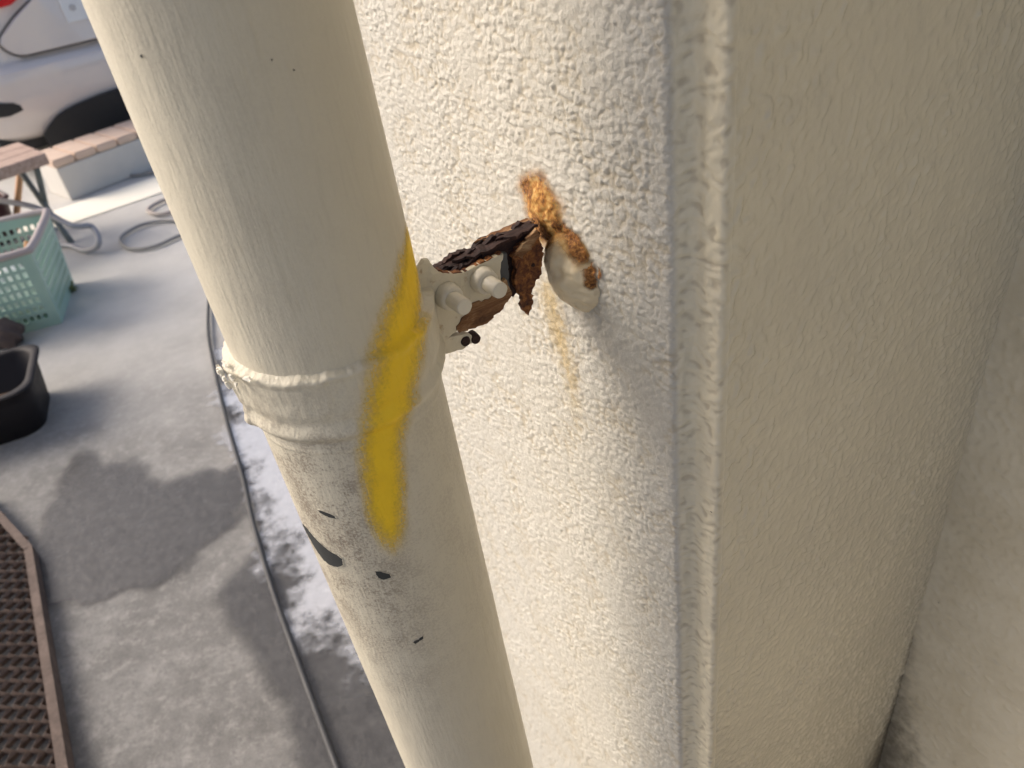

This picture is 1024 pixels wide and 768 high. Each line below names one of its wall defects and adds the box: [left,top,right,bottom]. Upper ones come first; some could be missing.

corrosion [433,175,601,333]
damp [36,454,249,604]